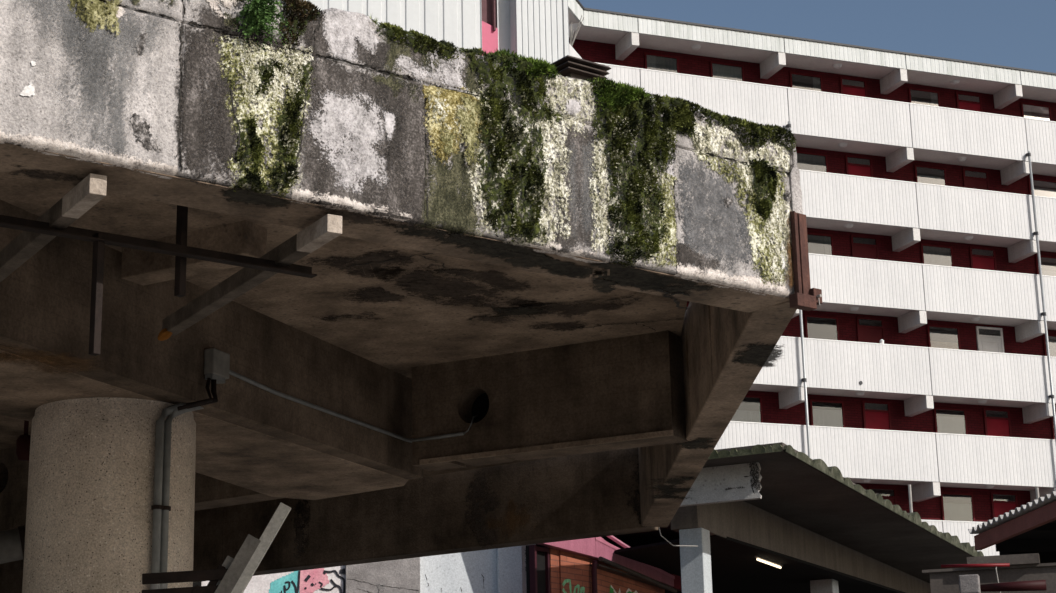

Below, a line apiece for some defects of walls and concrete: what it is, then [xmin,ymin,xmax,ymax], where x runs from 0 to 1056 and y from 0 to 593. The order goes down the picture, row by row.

crack [99,0,479,217]
leakage [9,0,792,331]
leakage [732,342,784,367]